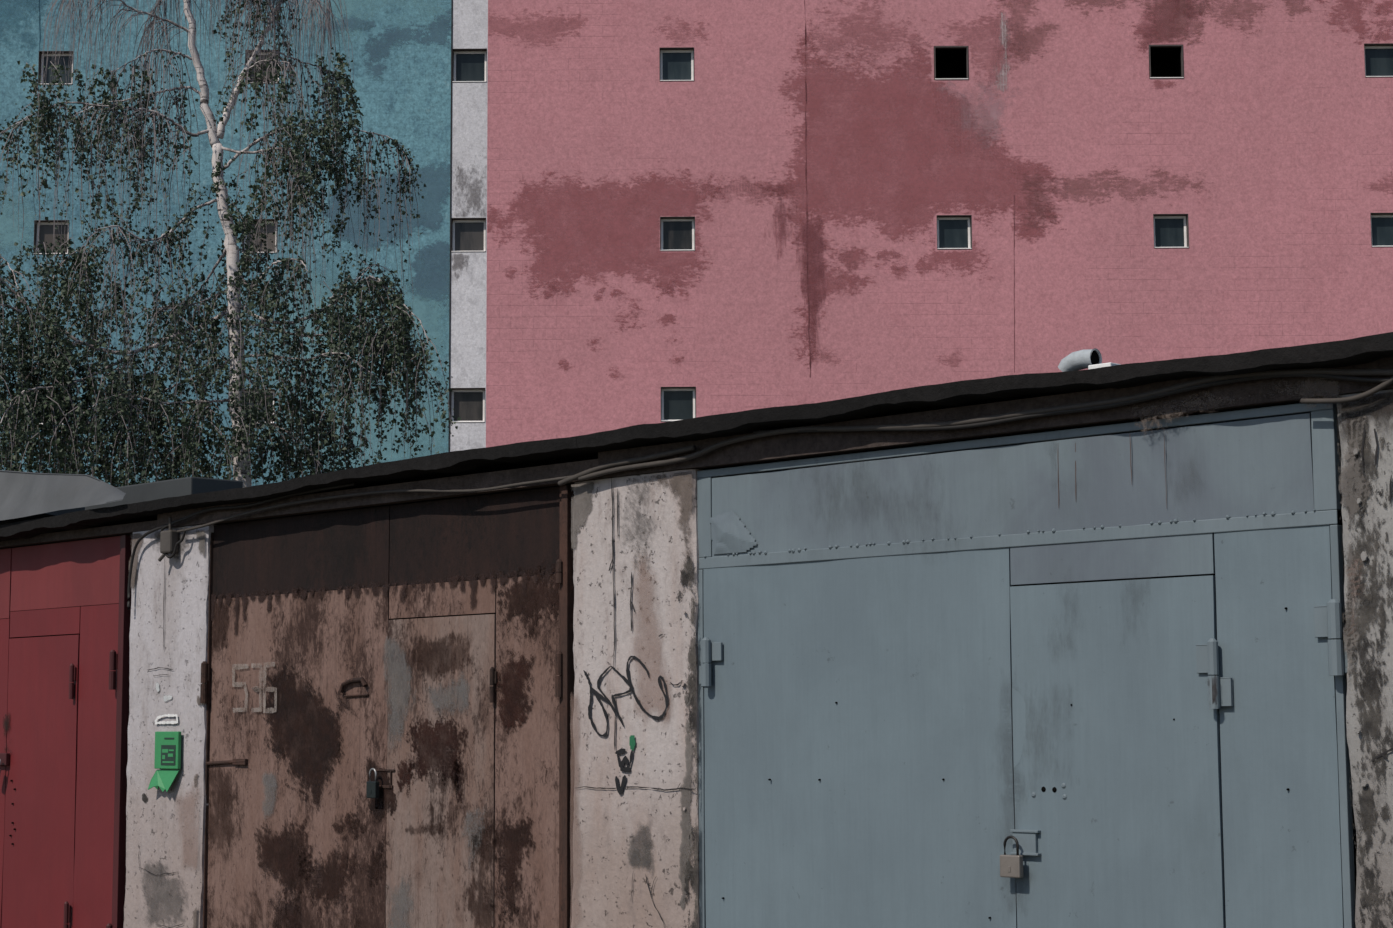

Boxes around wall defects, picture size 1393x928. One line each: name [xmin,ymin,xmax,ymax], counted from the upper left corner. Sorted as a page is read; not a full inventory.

peeling [1064,0,1393,50]
leakage [774,202,825,357]
corrosion [409,631,477,680]
corrosion [490,557,573,736]
spalling [1337,402,1393,928]
corrosion [207,659,540,928]